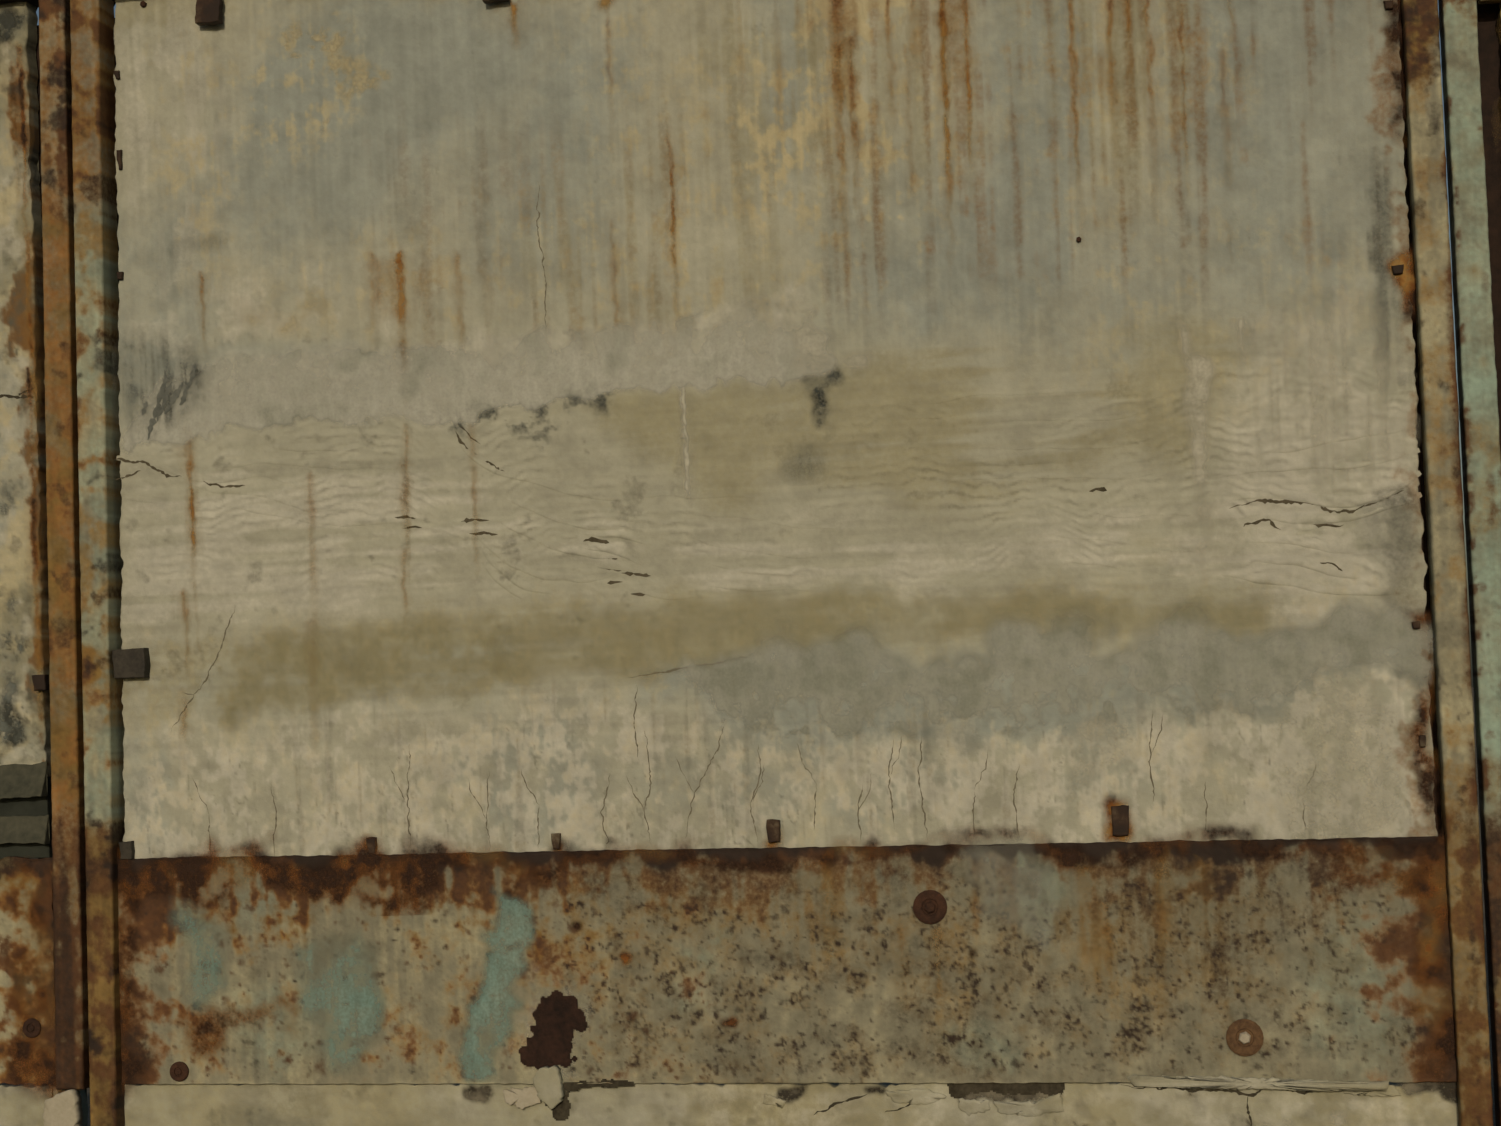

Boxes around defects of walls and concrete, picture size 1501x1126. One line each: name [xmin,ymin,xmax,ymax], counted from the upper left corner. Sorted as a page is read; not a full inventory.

rust [938,0,972,189]
damp [123,311,866,493]
crack [1229,490,1404,571]
damp [688,605,1435,736]
crack [600,656,748,843]
crack [857,738,928,839]
rust [1105,798,1166,868]
crack [1148,714,1163,801]
rust [1188,826,1289,860]
rust [117,839,469,950]
spalling [762,1085,805,1109]
spalling [947,1083,1065,1117]